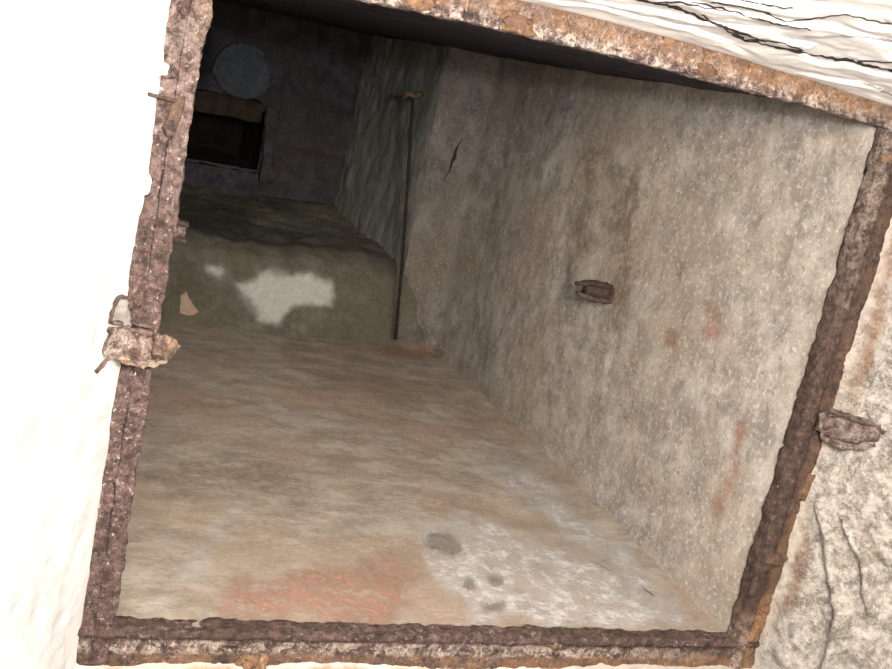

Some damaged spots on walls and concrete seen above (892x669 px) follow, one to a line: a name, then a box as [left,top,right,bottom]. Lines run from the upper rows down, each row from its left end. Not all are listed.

rust [177,0,192,19]
rust [401,0,435,11]
rust [499,10,537,37]
crack [636,0,892,96]
rust [163,95,185,140]
rust [797,473,816,502]
rust [747,614,763,645]
rust [234,652,269,669]